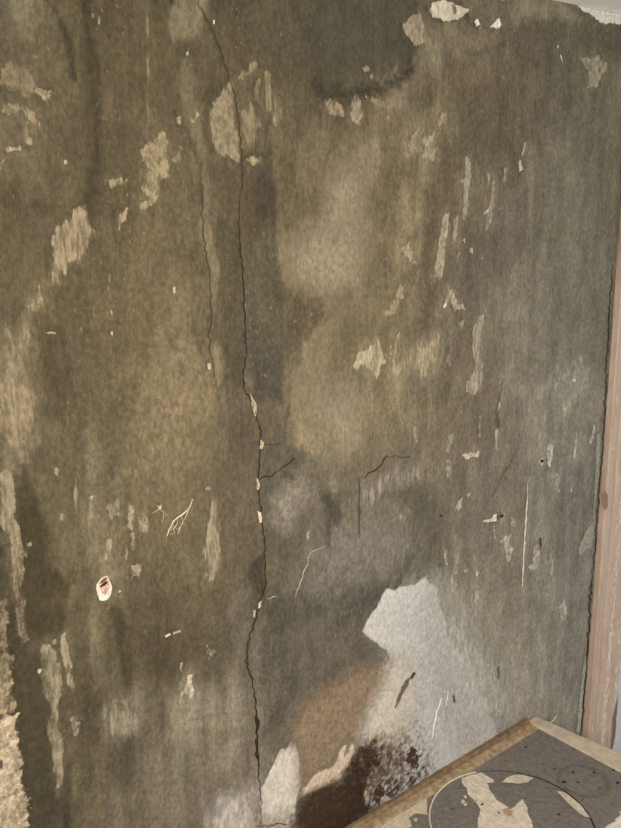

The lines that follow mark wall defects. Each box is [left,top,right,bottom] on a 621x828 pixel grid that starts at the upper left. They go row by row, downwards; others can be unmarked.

peeling [430,0,469,22]
crack [197,1,295,827]
leakage [19,492,42,635]
leakage [104,538,112,560]
leakage [105,496,123,520]
leakage [547,444,572,495]
spalling [0,599,33,828]
leakage [0,570,50,828]
leakage [60,632,74,689]
leakage [70,715,80,736]
peeling [360,577,510,808]
peeling [207,741,301,828]